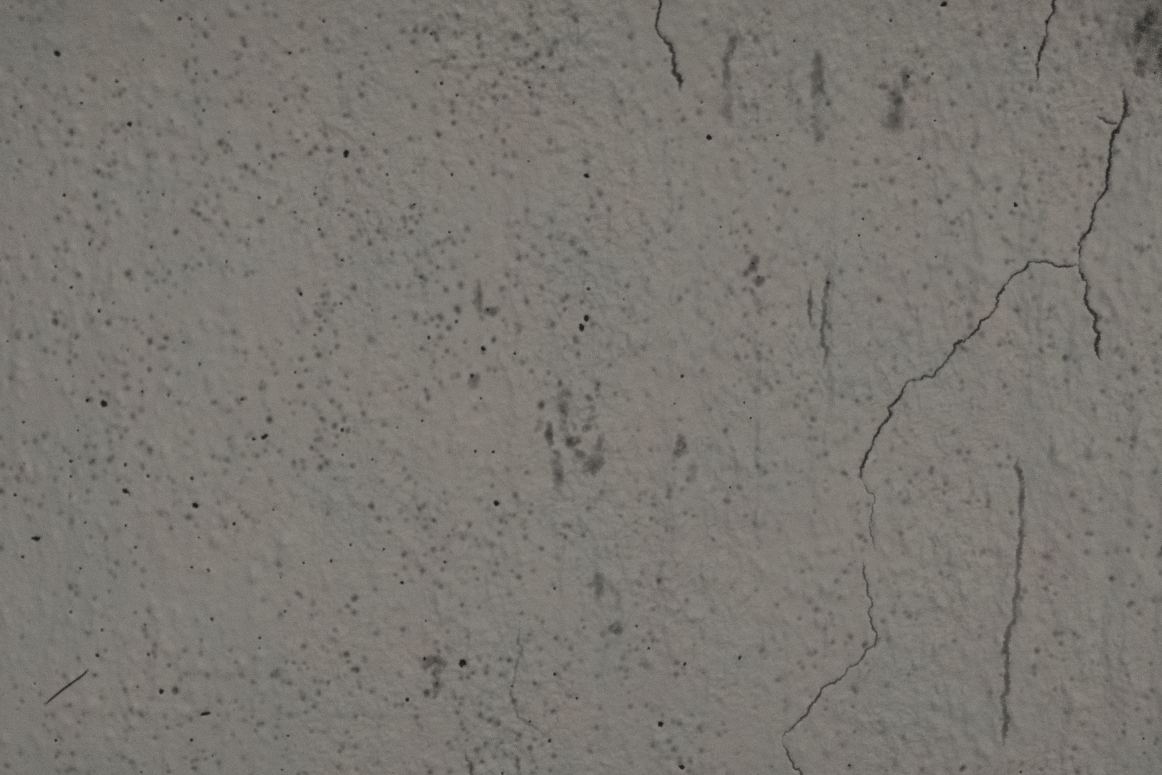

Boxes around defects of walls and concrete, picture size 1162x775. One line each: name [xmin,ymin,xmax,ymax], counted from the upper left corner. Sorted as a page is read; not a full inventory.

crack [655,0,683,85]
crack [860,95,1128,472]
crack [798,679,840,722]